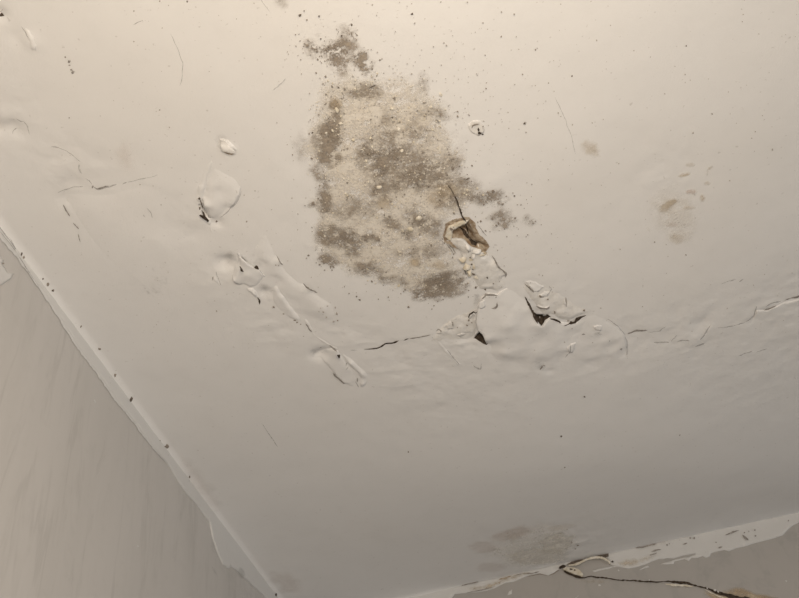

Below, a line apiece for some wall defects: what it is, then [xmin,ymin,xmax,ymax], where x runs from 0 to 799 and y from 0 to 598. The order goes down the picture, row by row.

mould [284,19,542,306]
peeling [196,161,241,232]
flaking render [433,217,588,363]
crack [734,296,799,326]
peeling [304,319,368,387]
crack [366,335,429,350]
peeling [559,553,614,579]
crack [462,570,558,593]
crack [579,576,749,598]